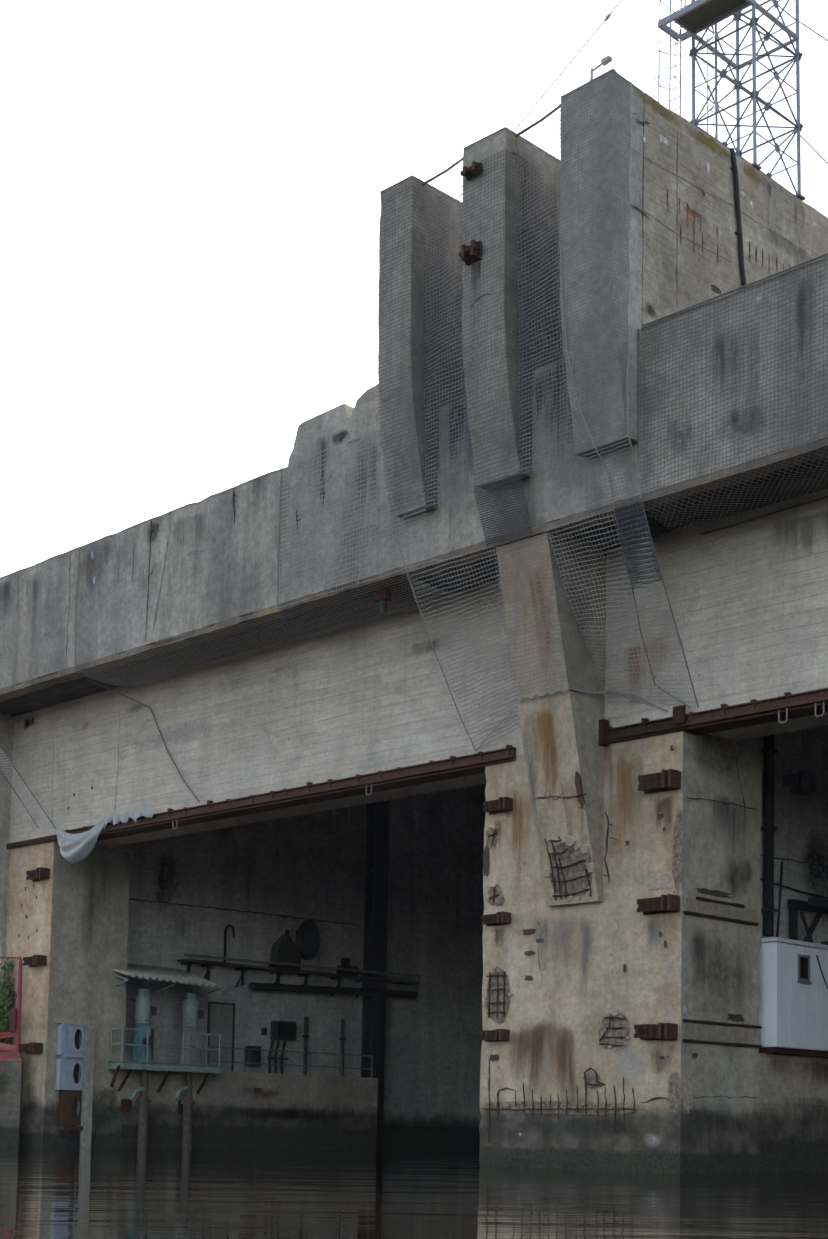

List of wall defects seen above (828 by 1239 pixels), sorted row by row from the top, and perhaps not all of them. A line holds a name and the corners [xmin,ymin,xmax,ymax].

spalling [545,836,595,901]
spalling [481,965,513,1024]
spalling [598,1010,630,1051]
spalling [482,1055,644,1143]